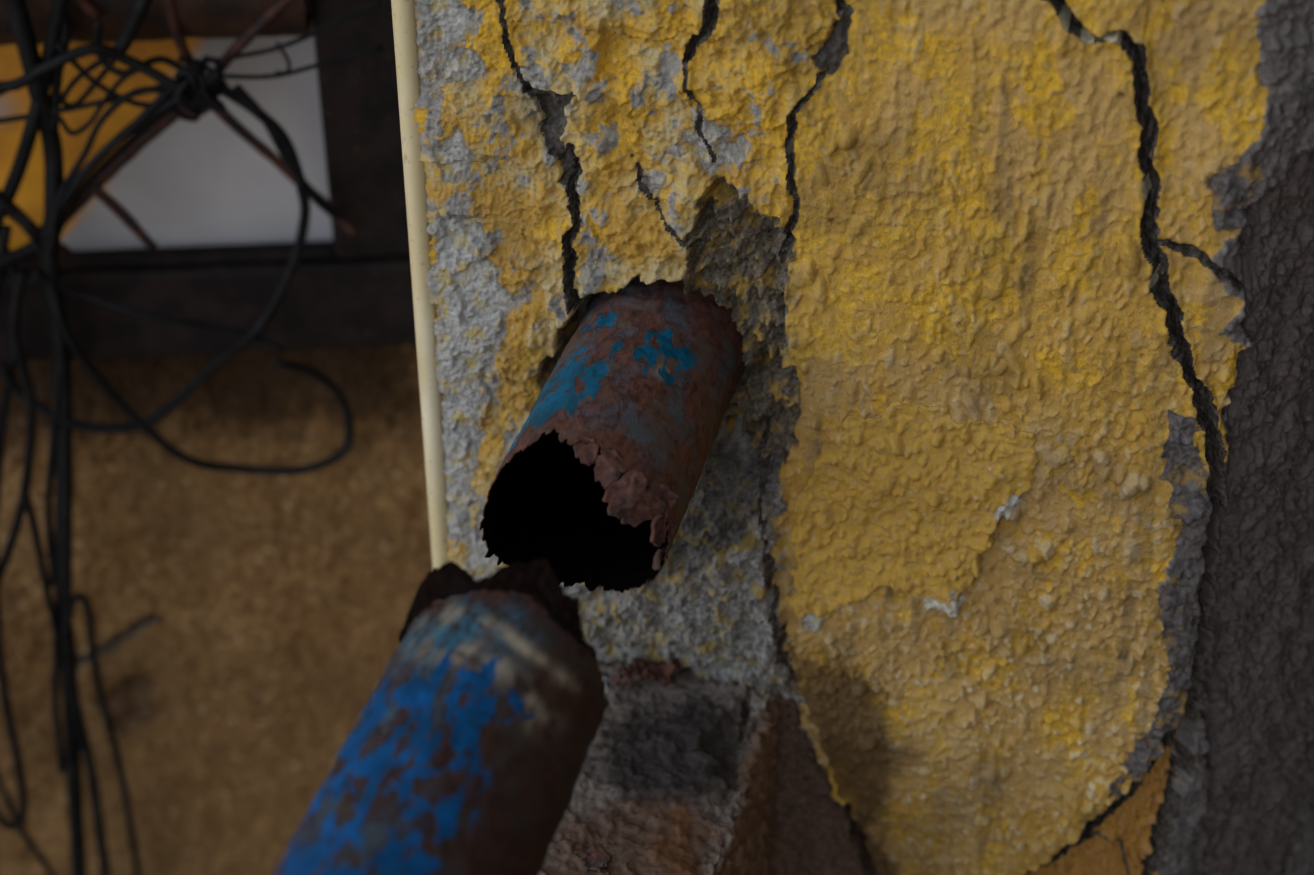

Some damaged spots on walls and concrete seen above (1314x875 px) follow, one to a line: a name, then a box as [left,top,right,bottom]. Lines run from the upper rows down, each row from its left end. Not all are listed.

crack [495,0,577,98]
crack [561,142,583,314]
crack [630,154,704,250]
crack [682,0,720,163]
crack [779,69,827,260]
crack [836,0,850,17]
peeling [429,215,516,581]
spalling [537,293,595,389]
flaking render [561,100,1039,704]
crack [1025,0,1243,875]
flaking render [1109,150,1314,875]